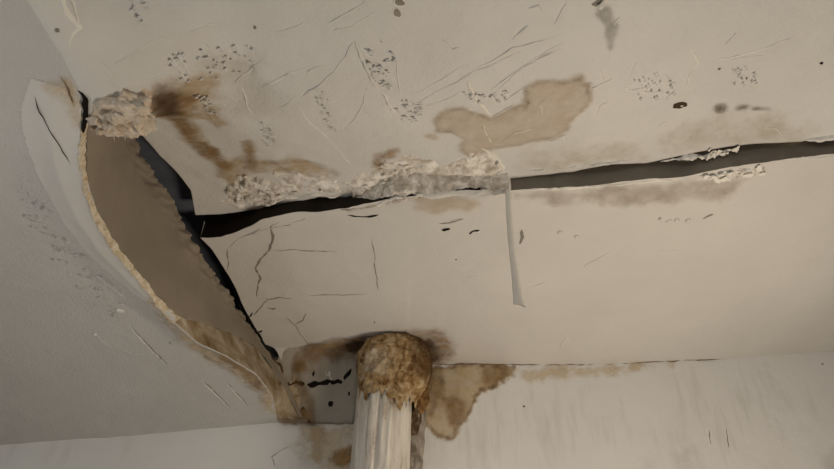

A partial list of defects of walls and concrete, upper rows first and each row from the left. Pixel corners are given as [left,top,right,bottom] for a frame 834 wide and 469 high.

damp [153,81,241,182]
crack [456,140,834,191]
crack [198,194,417,388]
damp [288,388,352,469]
damp [293,339,365,379]
damp [417,332,515,439]